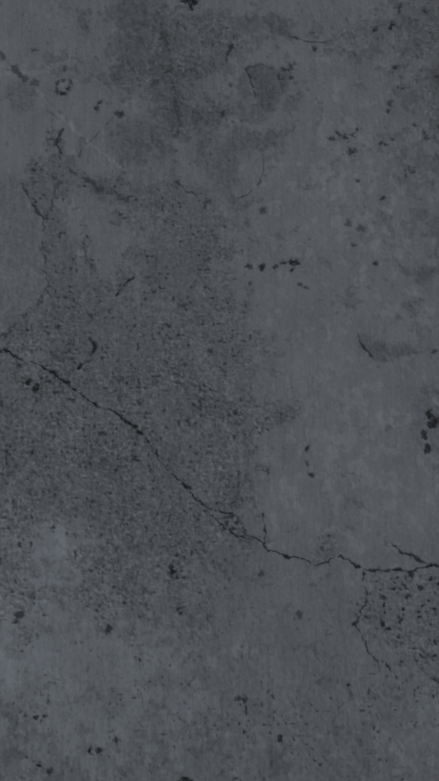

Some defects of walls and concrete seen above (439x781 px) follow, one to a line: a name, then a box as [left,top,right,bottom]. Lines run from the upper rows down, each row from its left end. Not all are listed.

crack [0,334,439,681]